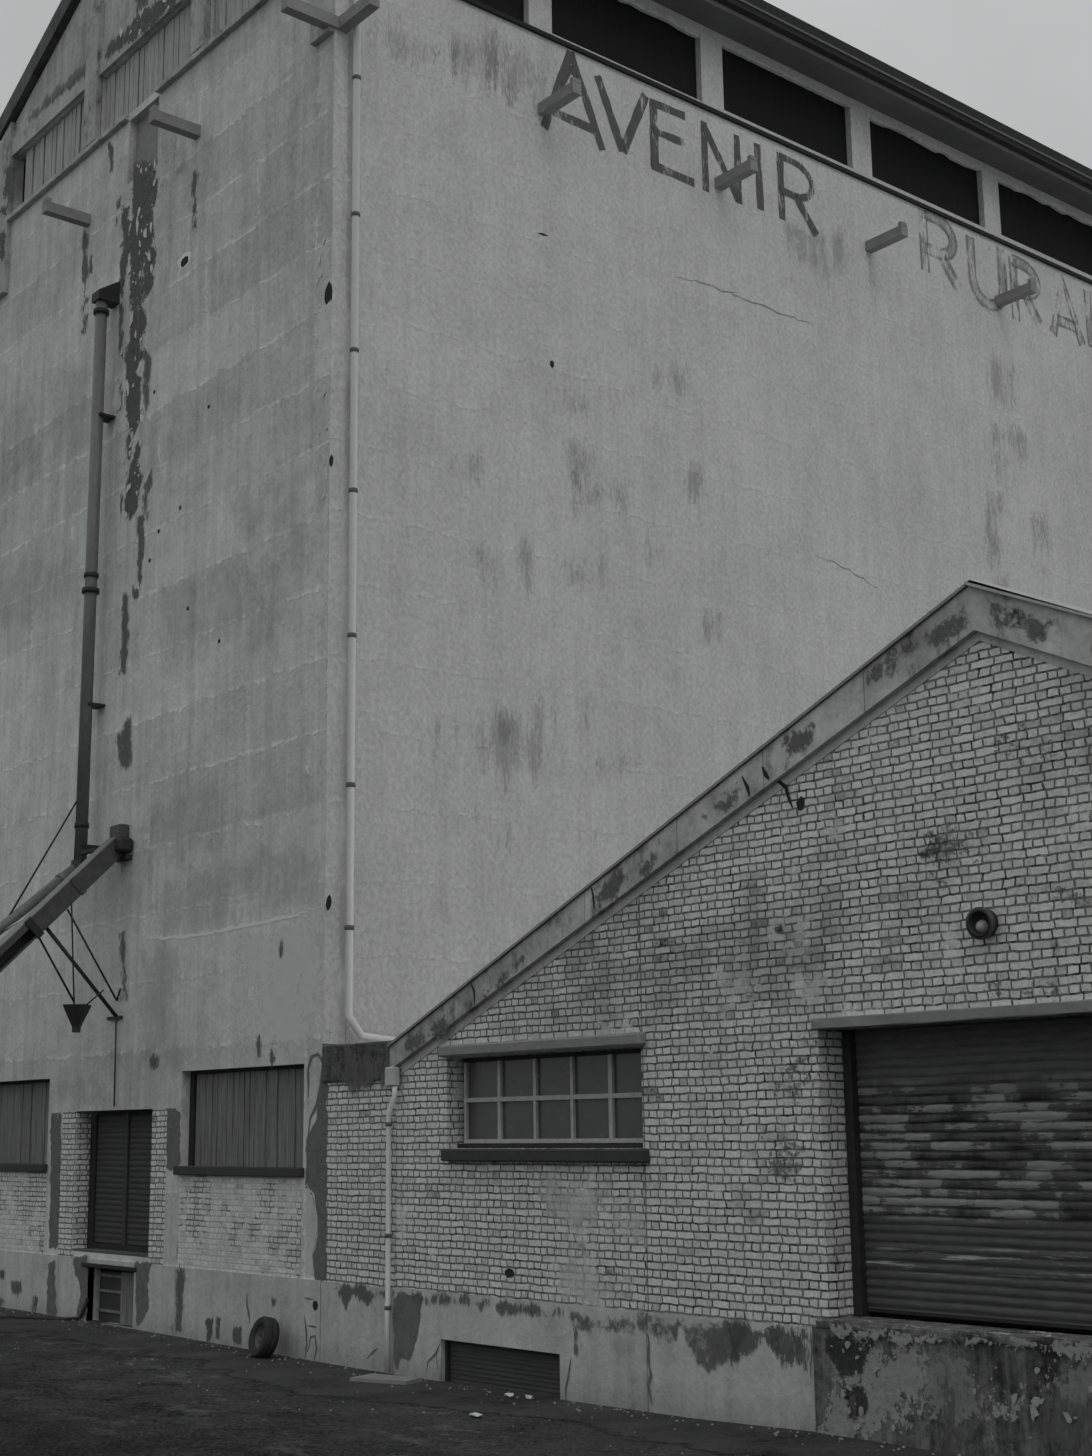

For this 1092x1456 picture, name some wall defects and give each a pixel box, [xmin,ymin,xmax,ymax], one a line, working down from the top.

flaking render [26,0,176,123]
flaking render [117,159,158,676]
flaking render [117,714,132,769]
flaking render [118,931,127,1000]
damp [411,1289,811,1372]
peeling [817,1322,1092,1447]